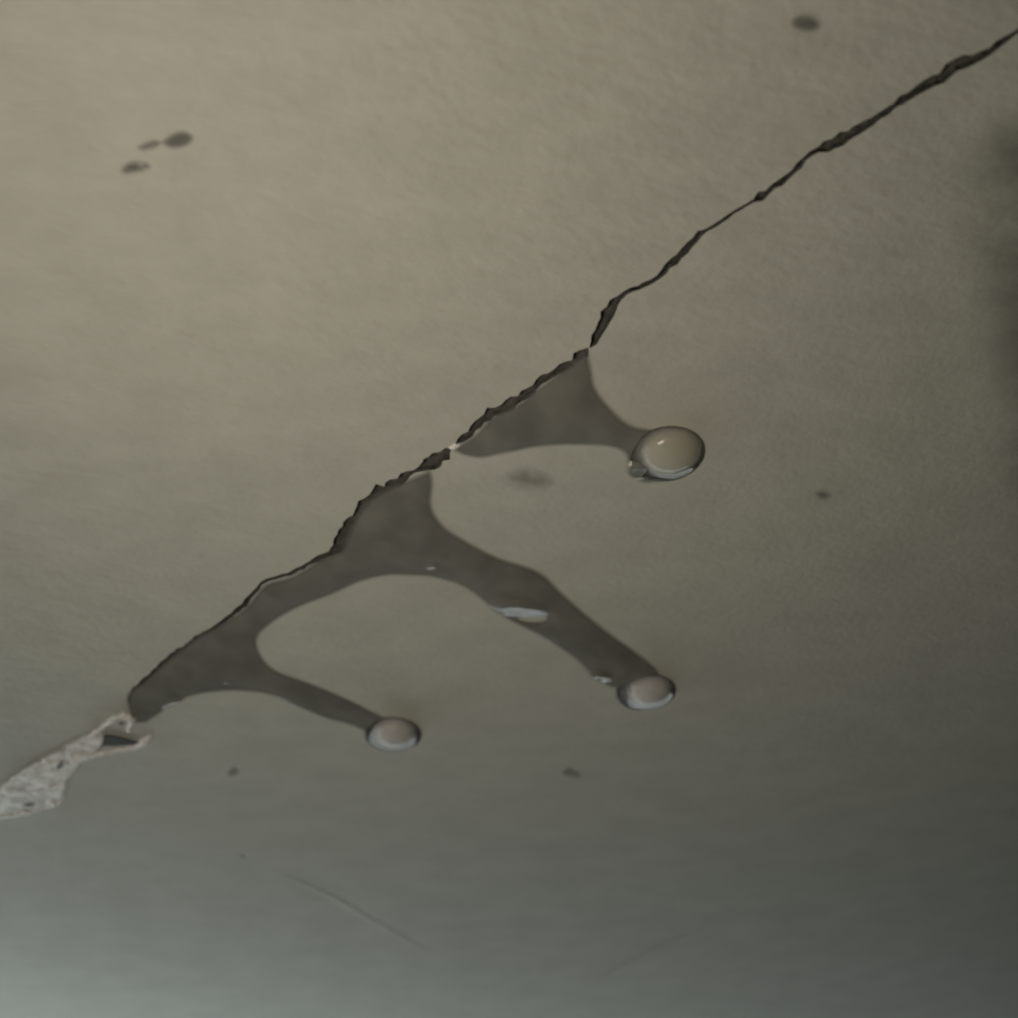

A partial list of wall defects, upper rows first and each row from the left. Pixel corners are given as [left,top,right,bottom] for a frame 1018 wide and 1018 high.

damp [449,356,653,481]
crack [128,29,1018,703]
damp [0,473,658,820]